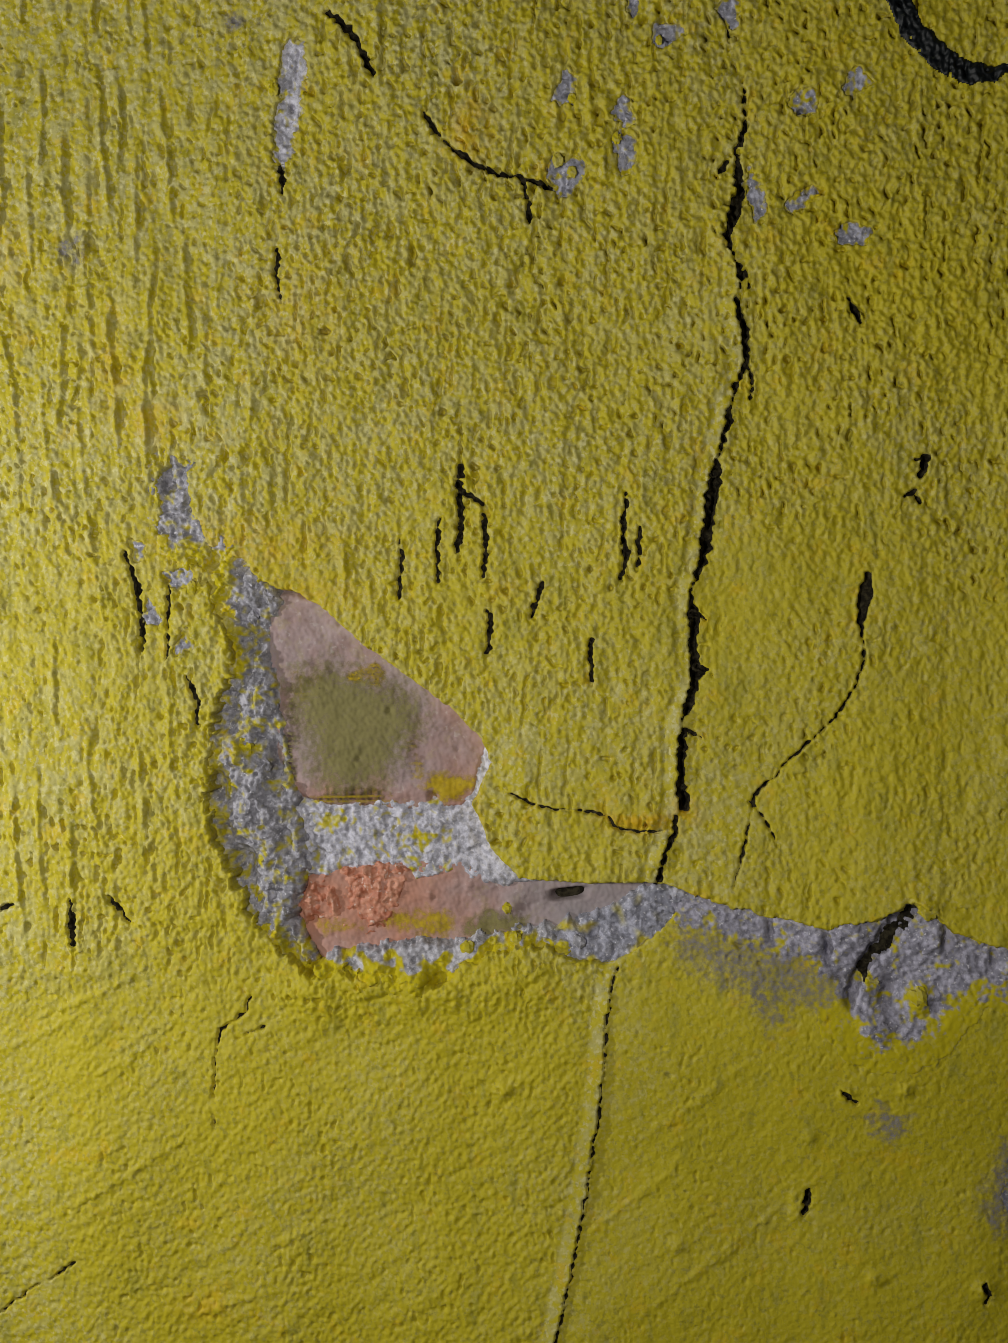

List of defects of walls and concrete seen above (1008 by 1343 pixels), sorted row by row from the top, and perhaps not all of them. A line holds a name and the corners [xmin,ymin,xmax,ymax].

peeling [268,37,308,194]
crack [423,112,553,224]
peeling [551,69,577,106]
peeling [546,153,587,201]
peeling [611,94,637,176]
peeling [652,21,684,49]
peeling [741,165,768,224]
peeling [827,221,873,246]
crack [510,88,754,885]
flaking render [128,450,1008,1076]
crack [734,572,873,887]
crack [554,967,619,1343]